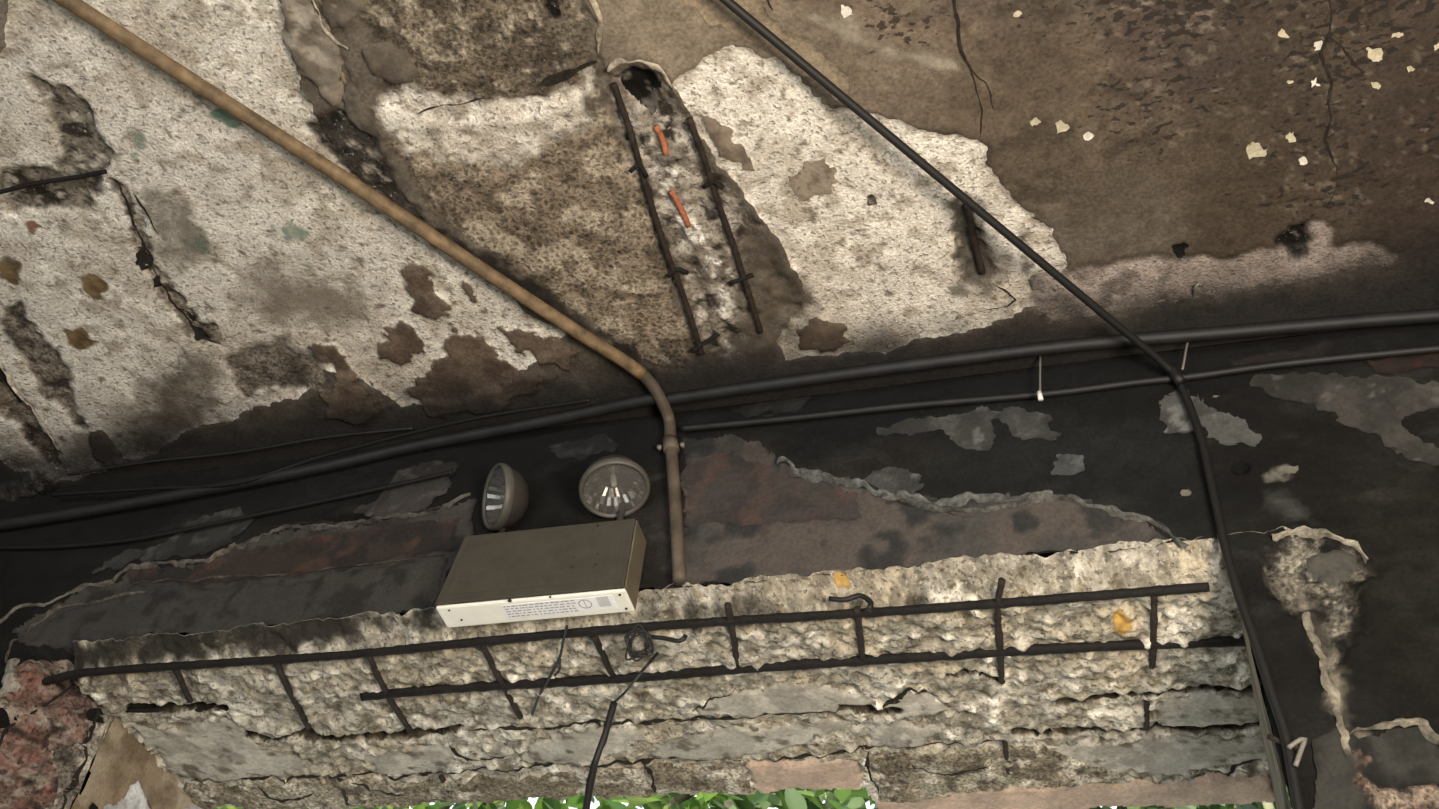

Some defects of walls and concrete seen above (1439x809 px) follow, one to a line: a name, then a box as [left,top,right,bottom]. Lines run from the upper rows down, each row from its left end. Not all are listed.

crack [952,0,995,136]
crack [1315,0,1364,208]
flaking render [0,0,1397,486]
peeling [1231,341,1439,466]
flaking render [680,405,1189,586]
flaking render [0,460,478,809]
water stain [1300,601,1344,709]
spalling [182,757,755,809]
crack [60,668,1286,809]
spalling [866,745,1125,803]